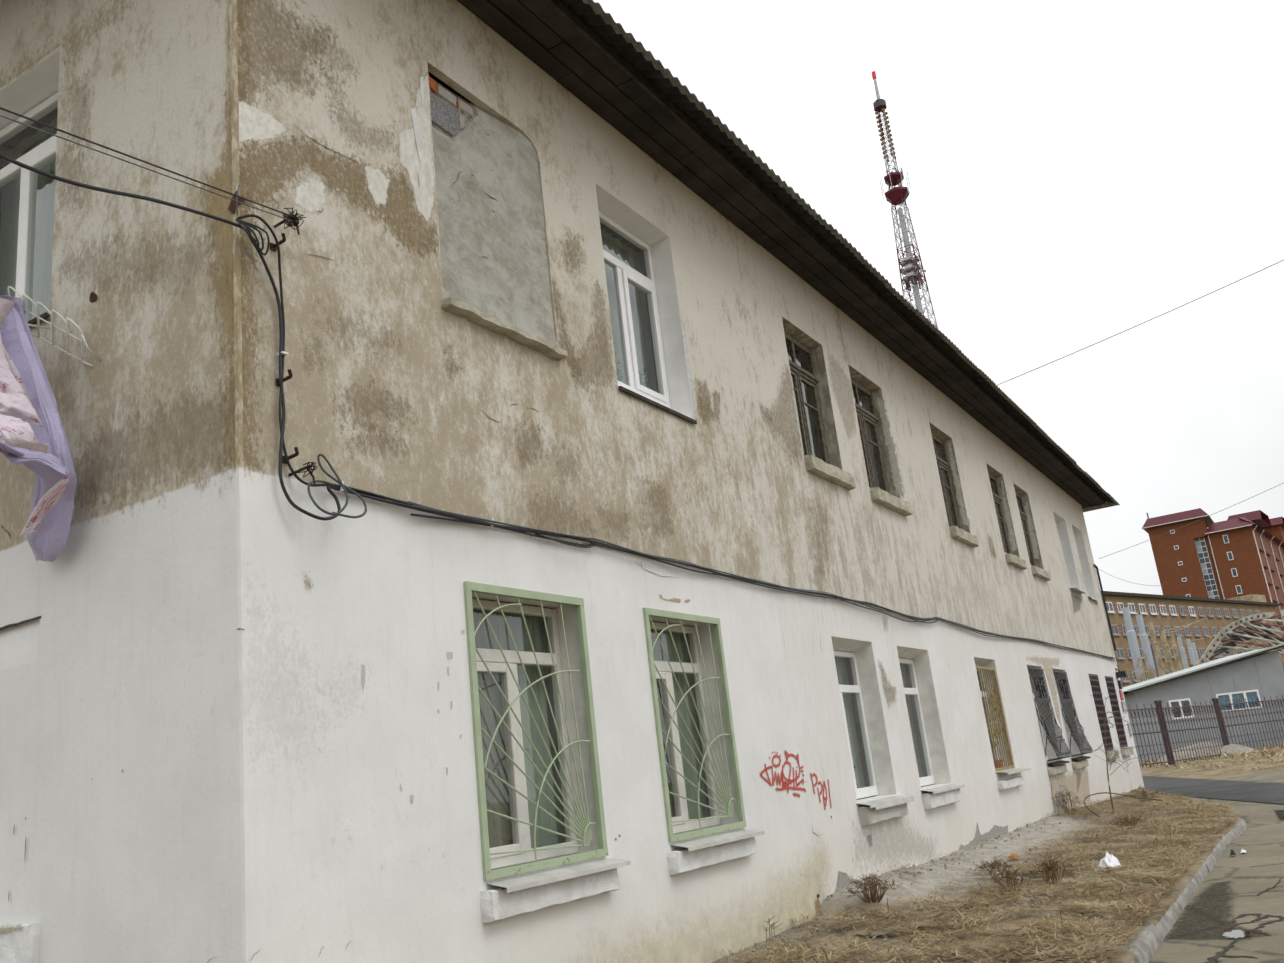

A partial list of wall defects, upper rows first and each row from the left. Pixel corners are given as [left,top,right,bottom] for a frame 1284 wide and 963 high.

leakage [200,0,439,471]
leakage [553,282,578,375]
leakage [697,382,720,425]
leakage [1071,594,1082,613]